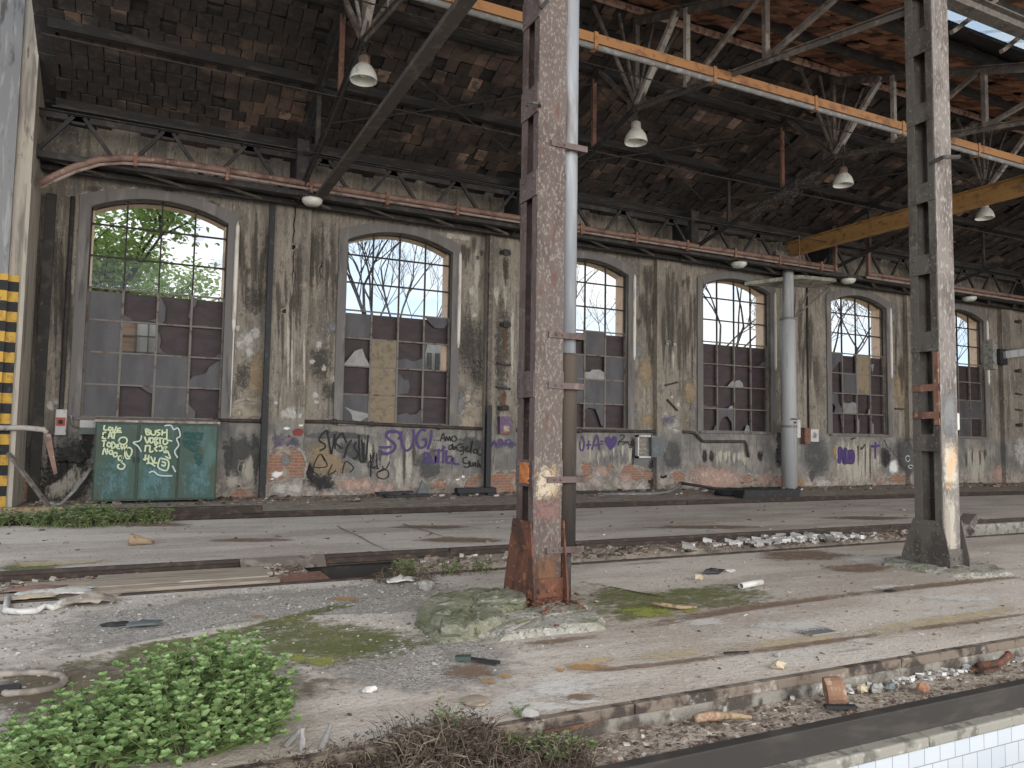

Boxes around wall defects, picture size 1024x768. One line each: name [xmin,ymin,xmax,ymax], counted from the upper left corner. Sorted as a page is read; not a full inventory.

damp [236,213,338,403]
crack [291,207,325,311]
damp [442,233,514,418]
damp [637,267,696,422]
damp [222,434,260,488]
flaking render [227,444,309,497]
flaking render [580,460,688,485]